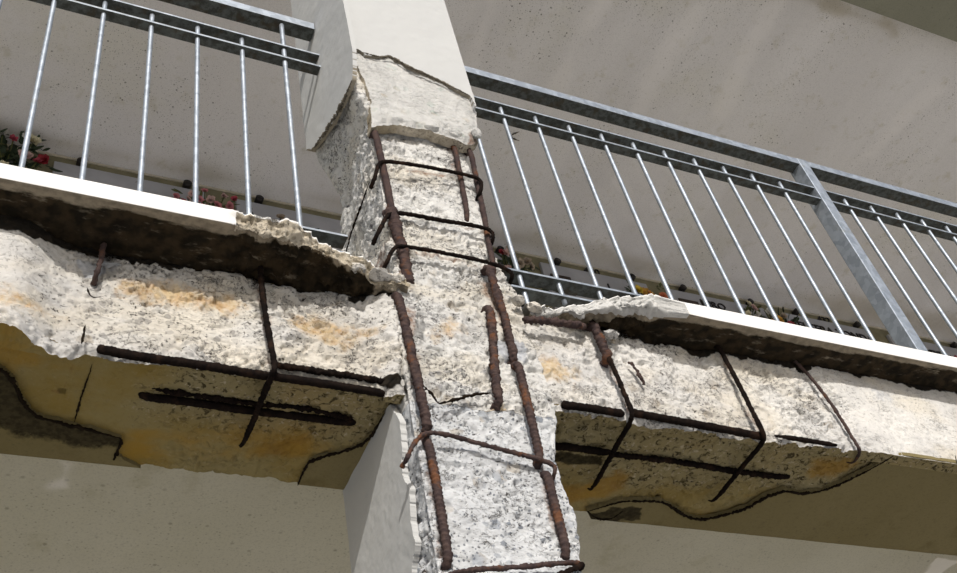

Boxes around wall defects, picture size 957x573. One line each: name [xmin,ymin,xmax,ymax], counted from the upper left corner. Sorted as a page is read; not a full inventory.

rust [341,125,479,251]
damp [0,347,120,498]
crack [0,365,123,461]
spalling [0,232,430,524]
rust [90,208,518,412]
crack [412,380,491,404]
rust [589,330,638,422]
spalling [316,53,957,573]
rust [715,352,769,438]
rust [407,429,459,573]
rust [532,462,578,567]